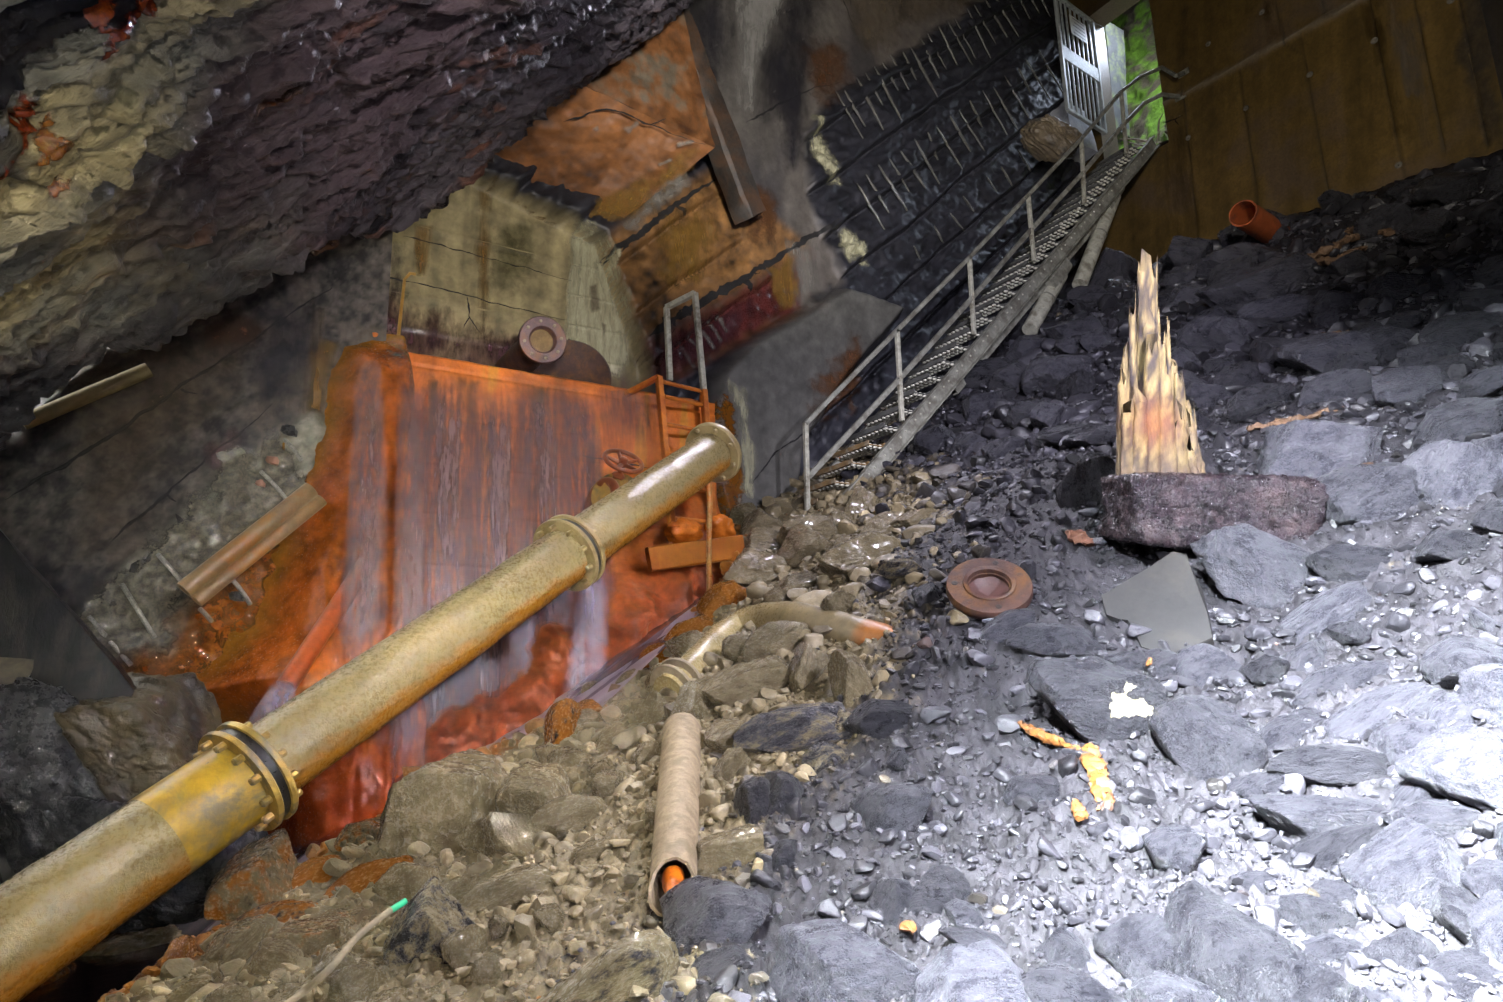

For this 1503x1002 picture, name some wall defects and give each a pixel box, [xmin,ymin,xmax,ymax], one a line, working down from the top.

crack [564,108,703,144]
crack [406,180,715,281]
crack [390,277,571,331]
corrosion [714,394,736,435]
corrosion [717,468,746,517]
corrosion [126,544,280,677]